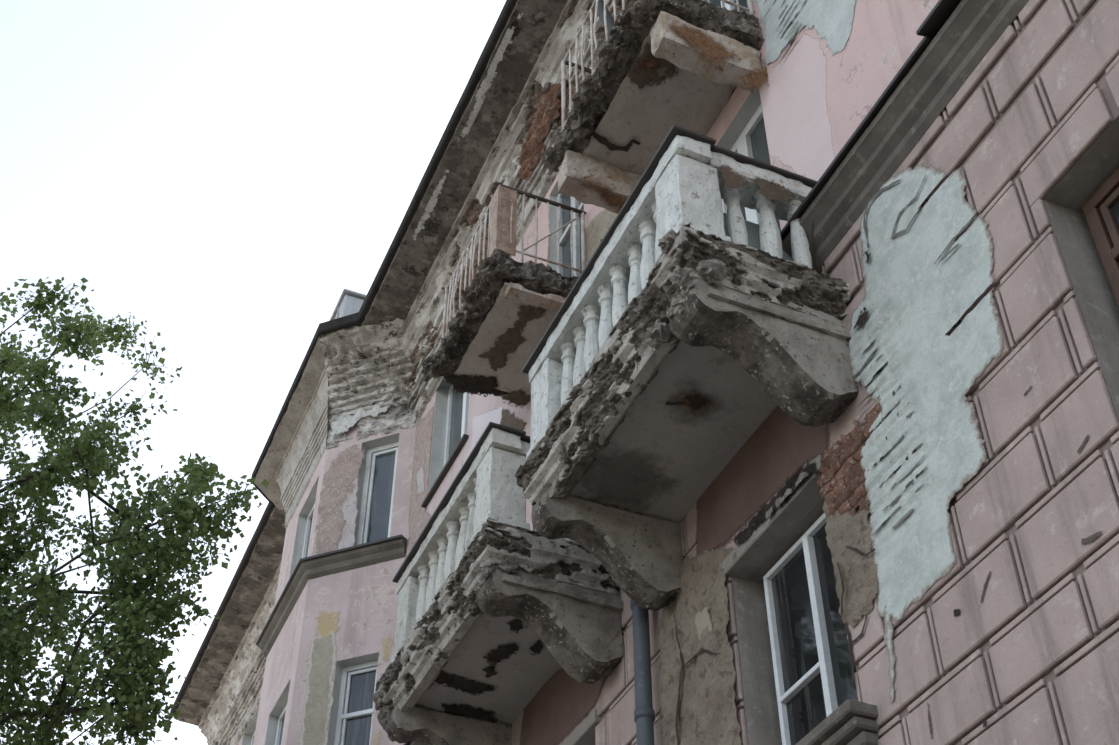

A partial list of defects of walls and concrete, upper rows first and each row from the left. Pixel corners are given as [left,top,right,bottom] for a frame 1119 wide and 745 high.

peeling [754,0,856,66]
spalling [516,0,652,198]
crack [582,124,640,152]
spalling [421,225,501,382]
spalling [479,304,547,369]
peeling [315,445,365,555]
peeling [330,398,393,437]
spalling [499,389,530,408]
peeling [658,163,1003,745]
flaking render [298,610,340,745]
spalling [435,619,545,723]
flaking render [520,668,607,745]